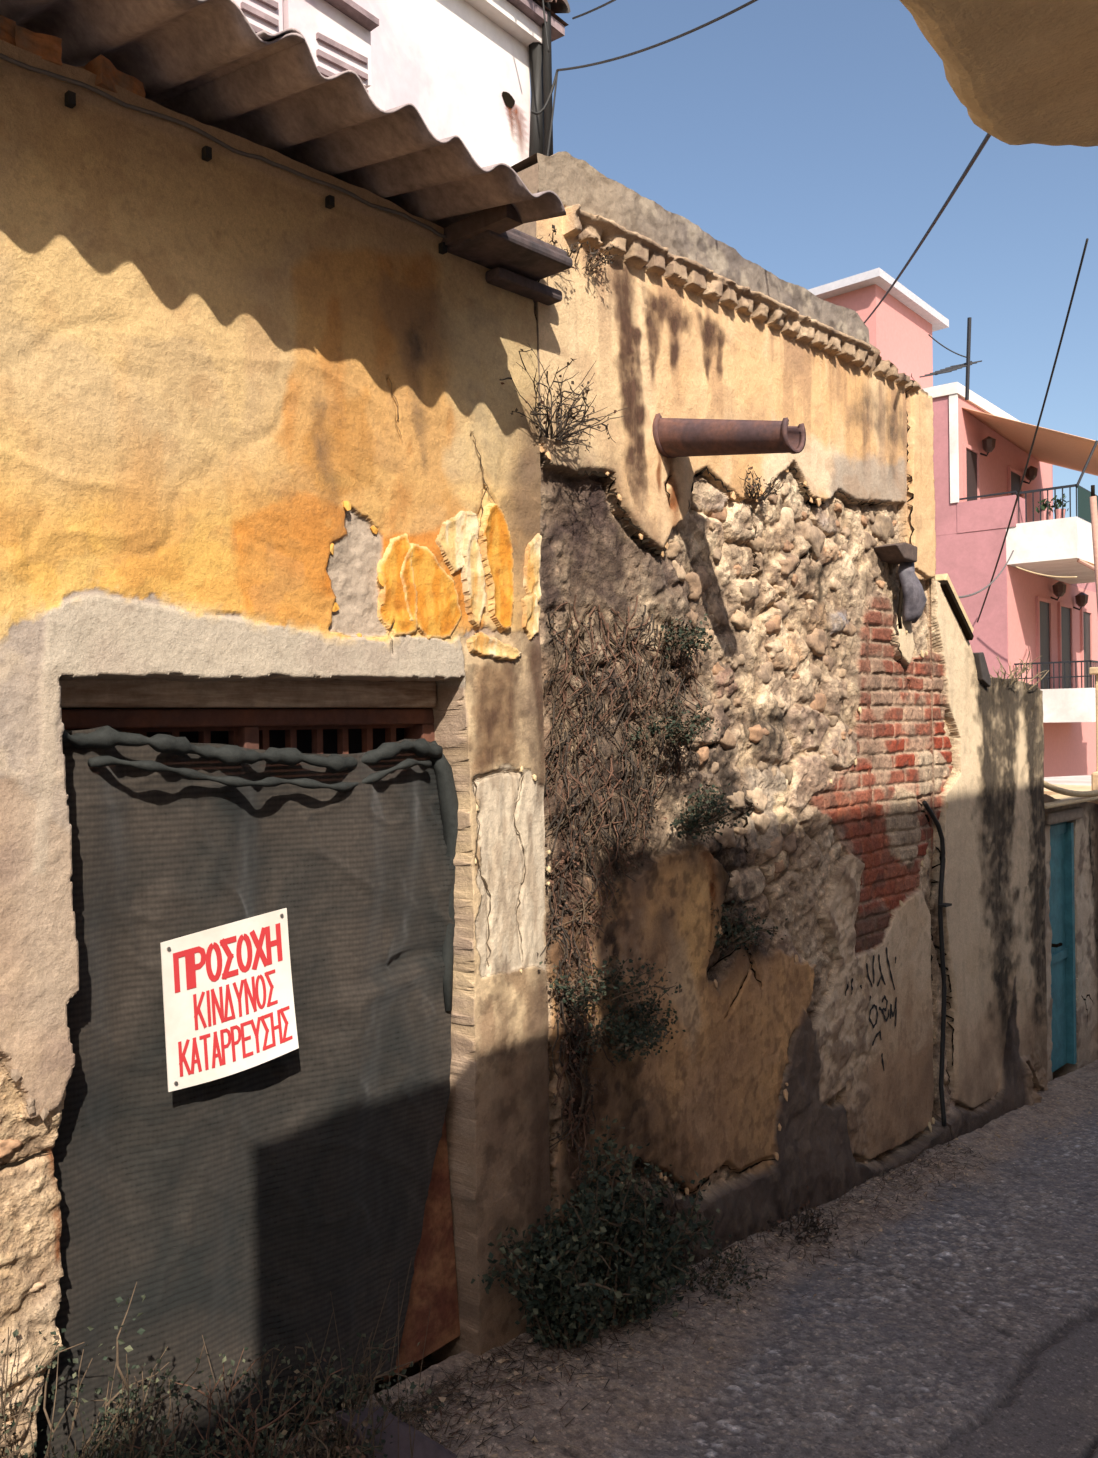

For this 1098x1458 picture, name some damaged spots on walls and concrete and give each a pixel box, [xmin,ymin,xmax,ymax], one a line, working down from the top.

water stain [614,265,723,494]
spalling [326,442,1001,1261]
water stain [978,677,1047,1029]
crack [0,1151,50,1170]
spalling [0,1051,66,1458]